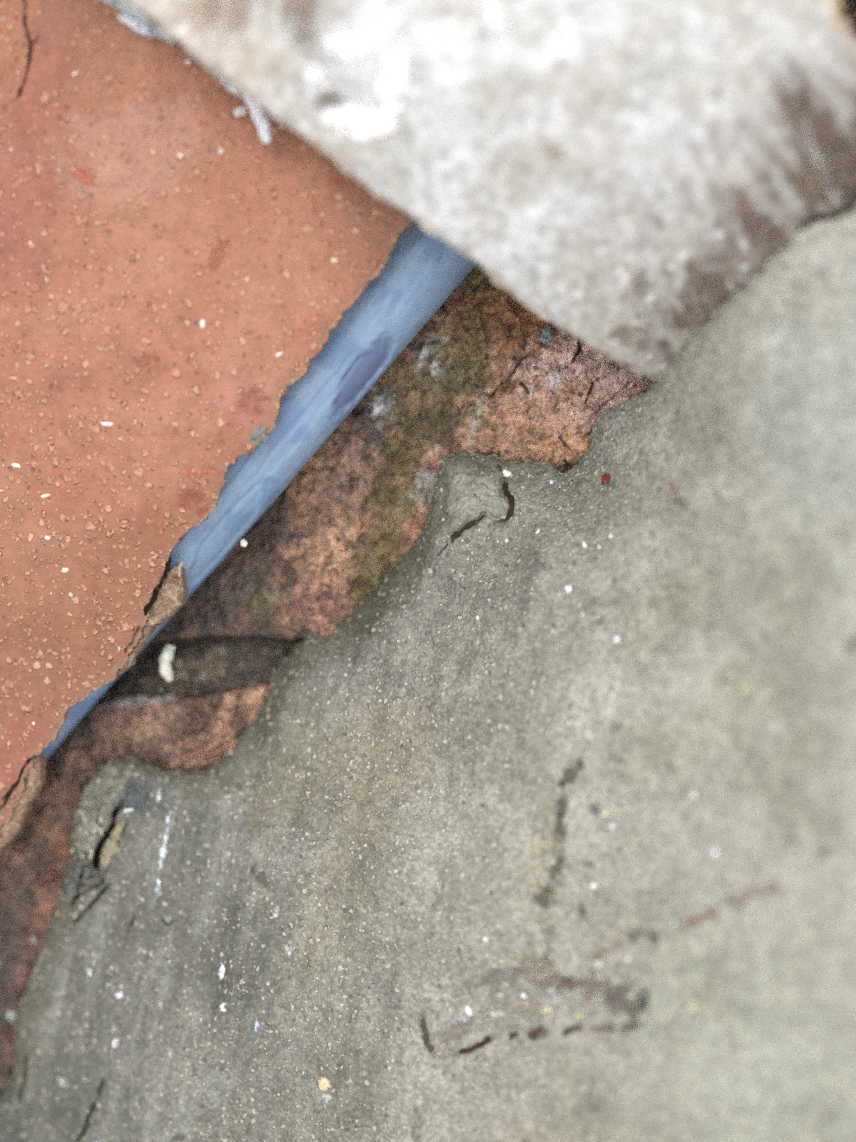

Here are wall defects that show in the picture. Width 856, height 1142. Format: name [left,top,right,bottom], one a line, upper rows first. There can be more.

spalling [180,220,413,520]
peeling [541,326,553,346]
spalling [115,529,189,679]
spalling [0,702,79,854]
spalling [62,759,134,907]
spalling [451,955,647,1037]
spalling [318,1076,332,1104]